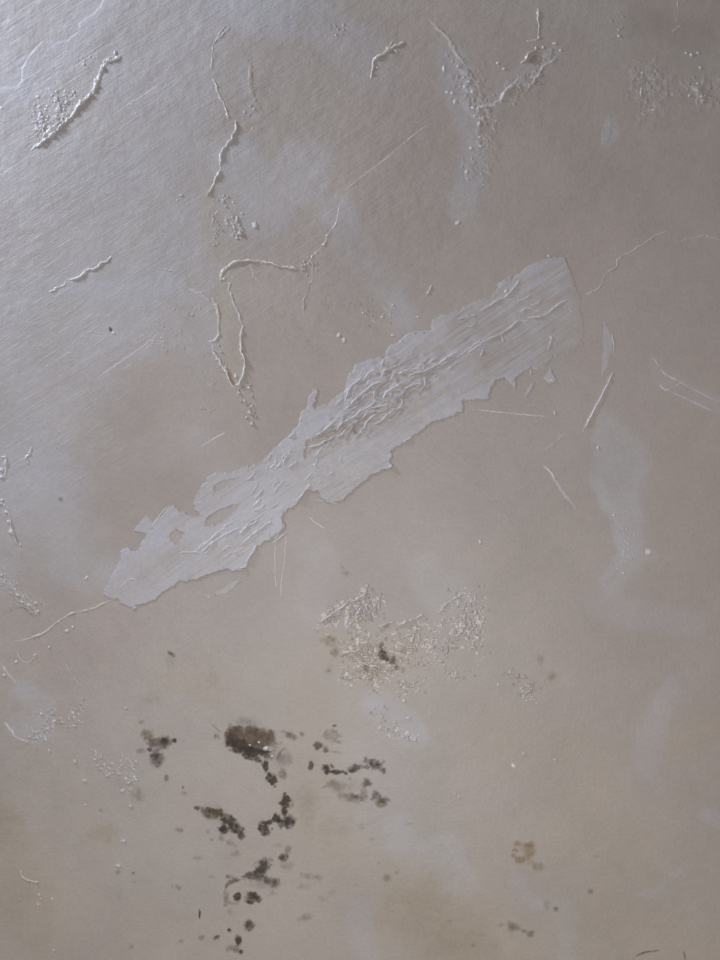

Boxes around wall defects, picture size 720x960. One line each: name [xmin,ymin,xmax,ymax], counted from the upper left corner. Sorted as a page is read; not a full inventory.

damp [144,731,176,763]
damp [225,726,277,785]
damp [309,761,385,774]
damp [195,807,244,837]
damp [258,793,295,836]
damp [226,860,269,904]